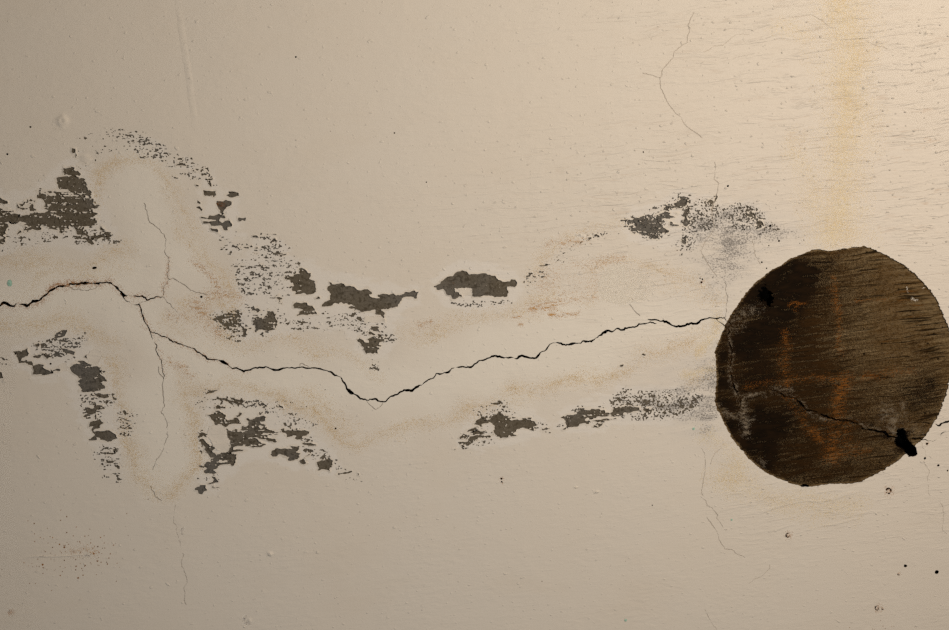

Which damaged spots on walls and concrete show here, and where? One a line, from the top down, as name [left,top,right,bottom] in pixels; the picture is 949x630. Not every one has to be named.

peeling [0,328,138,483]
peeling [0,129,420,371]
peeling [193,387,362,496]
crack [0,162,949,604]
leakage [87,0,949,528]
peeling [432,193,780,307]
peeling [451,237,949,487]